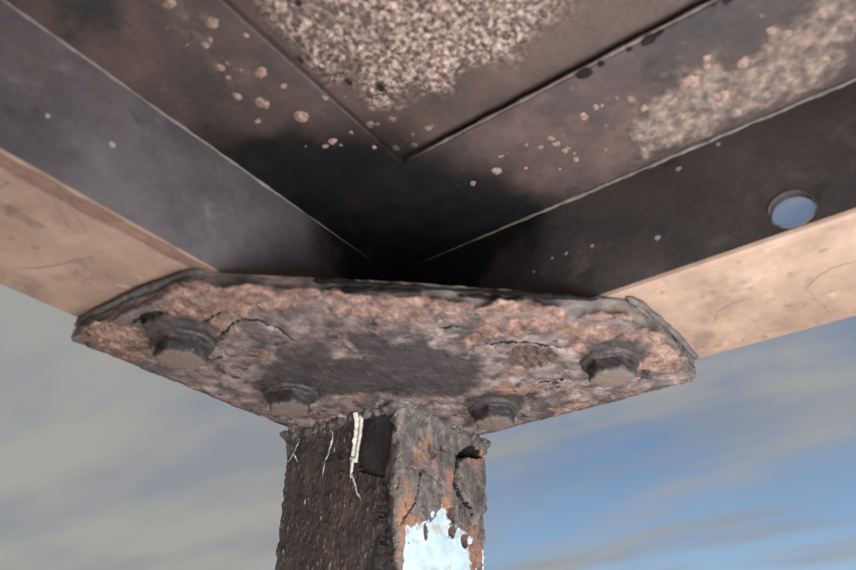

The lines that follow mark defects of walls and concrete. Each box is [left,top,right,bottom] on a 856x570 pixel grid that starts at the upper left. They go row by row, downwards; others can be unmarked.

spalling [259,0,566,110]
corrosion [293,111,309,122]
corrosion [0,153,217,273]
leakage [222,129,555,288]
corrosion [79,320,153,361]
crack [202,312,292,340]
leakage [254,332,525,410]
corrosion [153,282,687,372]
peeling [350,412,363,479]
crack [403,446,481,519]
peeling [403,504,485,570]
corrosion [468,544,477,570]